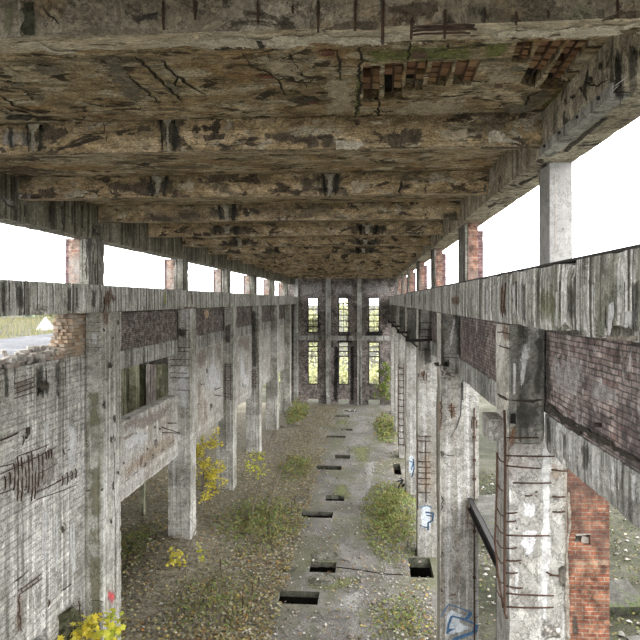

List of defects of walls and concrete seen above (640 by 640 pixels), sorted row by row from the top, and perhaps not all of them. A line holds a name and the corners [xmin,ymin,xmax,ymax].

crack [126,57,206,104]
flaking render [188,0,480,116]
crack [354,47,364,117]
flaking render [481,0,640,113]
water stain [23,123,49,152]
water stain [157,119,180,152]